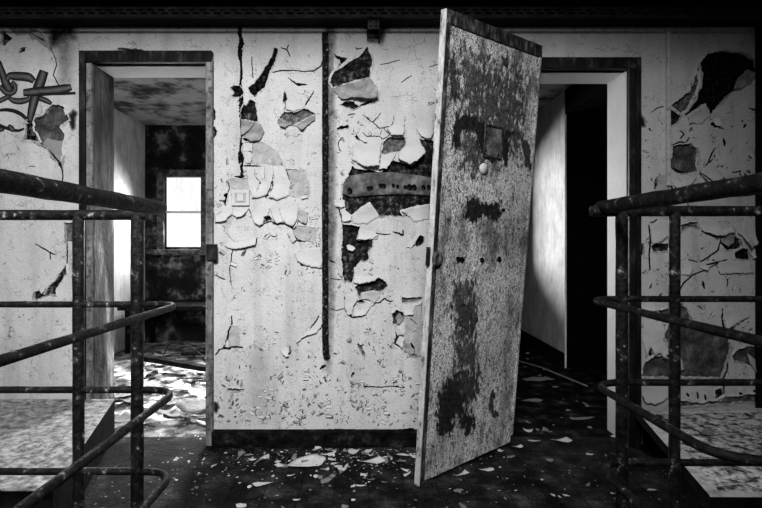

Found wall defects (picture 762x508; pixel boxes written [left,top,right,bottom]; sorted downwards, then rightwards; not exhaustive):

spalling [21,103,71,181]
crack [238,27,258,179]
crack [273,45,322,105]
spalling [651,48,756,191]
spalling [214,34,537,437]
spalling [641,304,668,405]
spalling [641,216,669,296]
spalling [681,216,759,409]